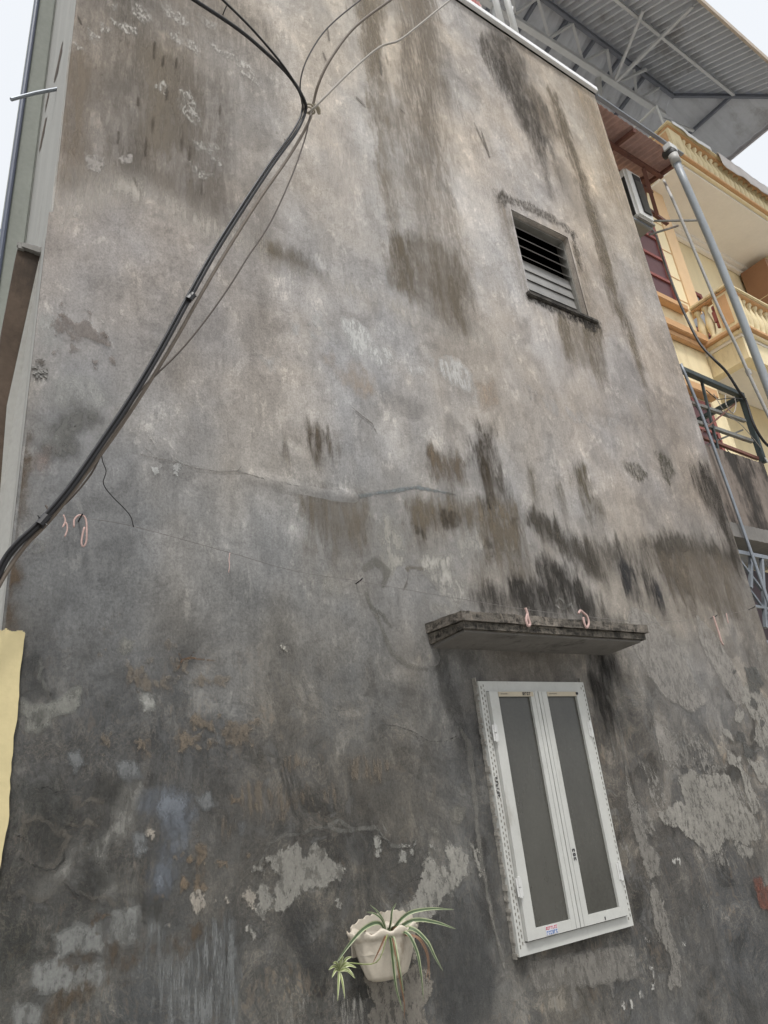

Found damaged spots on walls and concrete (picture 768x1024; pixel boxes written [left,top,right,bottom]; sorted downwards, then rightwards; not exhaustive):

leakage [399,0,436,146]
leakage [498,191,580,266]
leakage [533,87,615,293]
leakage [528,297,599,354]
crack [134,411,264,479]
leakage [342,425,636,602]
leakage [644,464,738,601]
leakage [509,555,592,617]
peeling [626,657,768,990]
peeling [175,836,227,915]
peeling [241,842,346,920]
peeling [397,840,482,919]